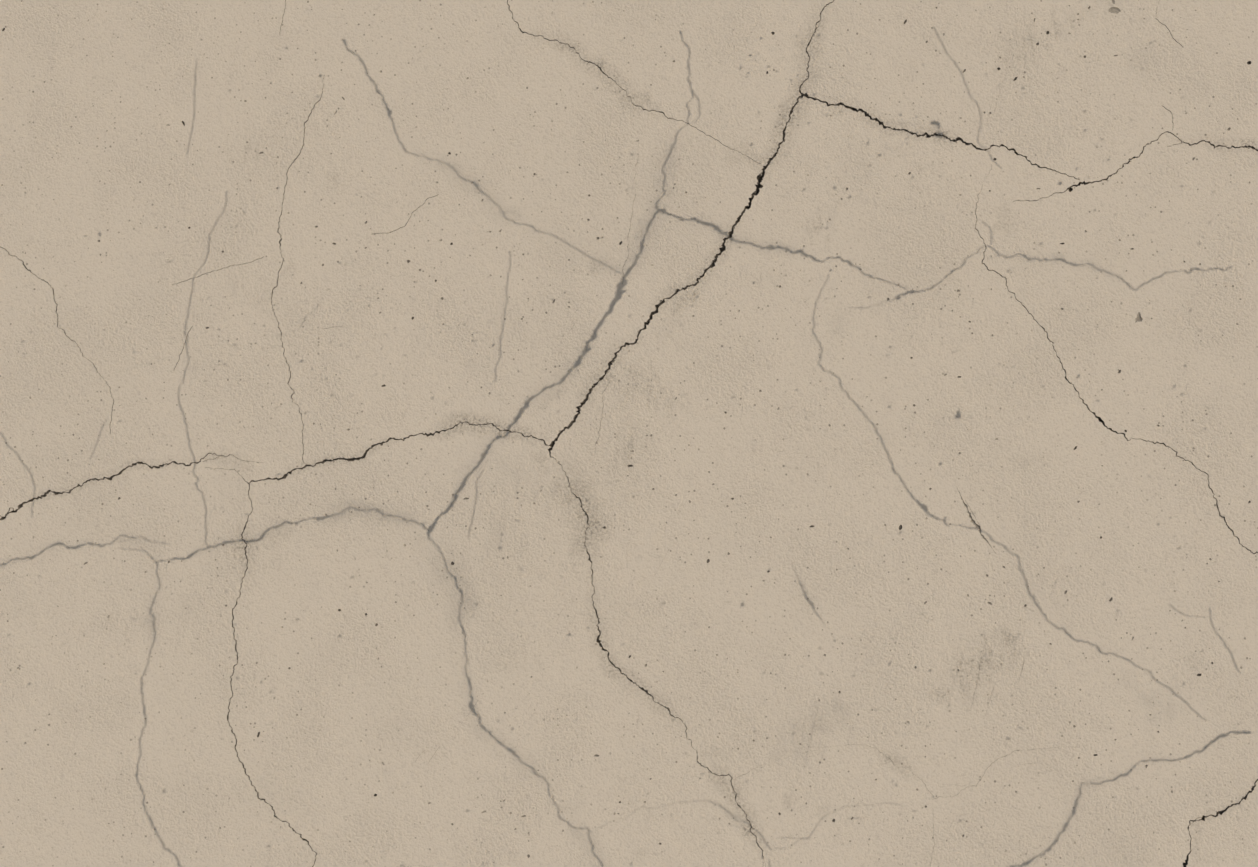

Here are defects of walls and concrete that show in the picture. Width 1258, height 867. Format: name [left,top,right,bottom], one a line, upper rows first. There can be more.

crack [1059,131,1258,193]
crack [1,247,114,434]
crack [0,453,261,520]
crack [227,0,1080,867]
crack [975,168,1258,554]
crack [1183,779,1258,867]